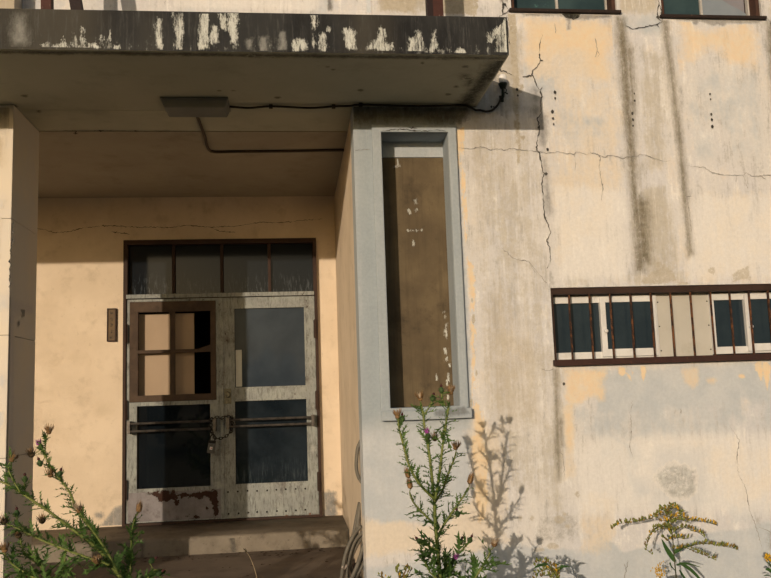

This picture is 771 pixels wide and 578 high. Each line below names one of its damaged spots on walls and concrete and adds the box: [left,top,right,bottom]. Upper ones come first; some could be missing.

crack [627,0,663,29]
crack [458,27,670,283]
leakage [522,12,657,278]
leakage [658,17,771,261]
crack [43,219,320,234]
crack [681,165,771,231]
peeling [679,364,719,390]
peeling [754,361,771,392]
rust [146,488,220,519]
crack [731,428,771,548]